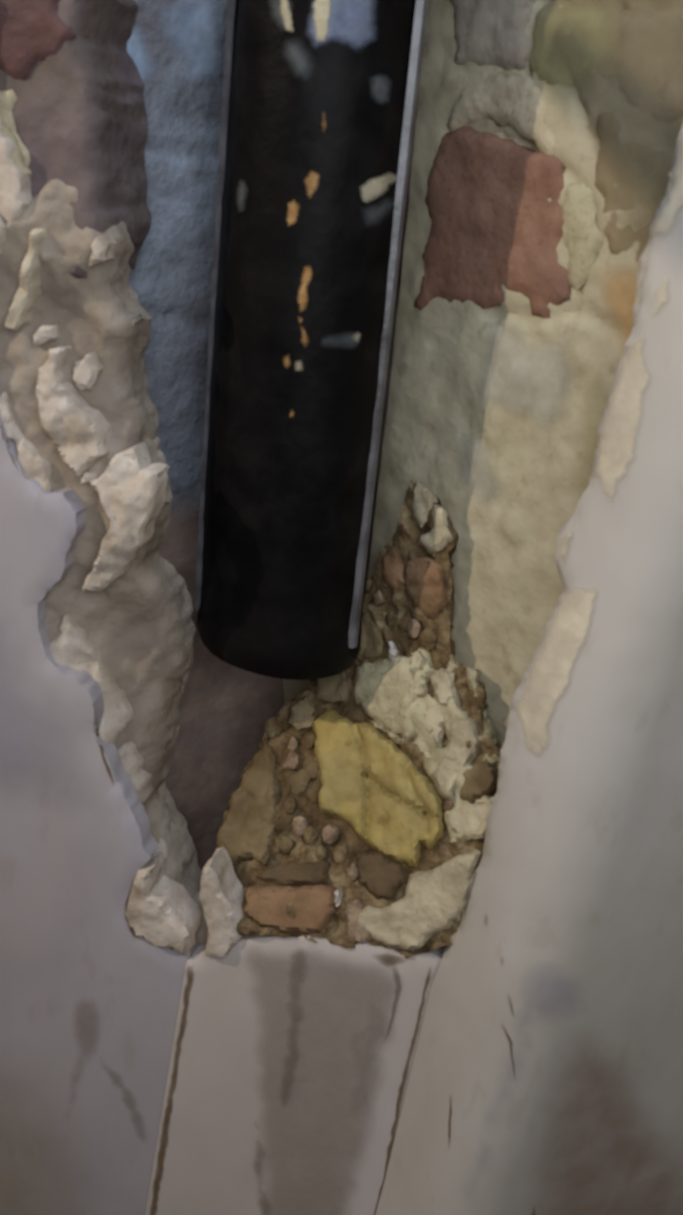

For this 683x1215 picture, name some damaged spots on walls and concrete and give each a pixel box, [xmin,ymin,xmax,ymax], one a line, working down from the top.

peeling [653,135,683,232]
peeling [597,340,649,498]
flaking render [0,114,244,957]
peeling [517,588,596,754]
water stain [256,954,389,1215]